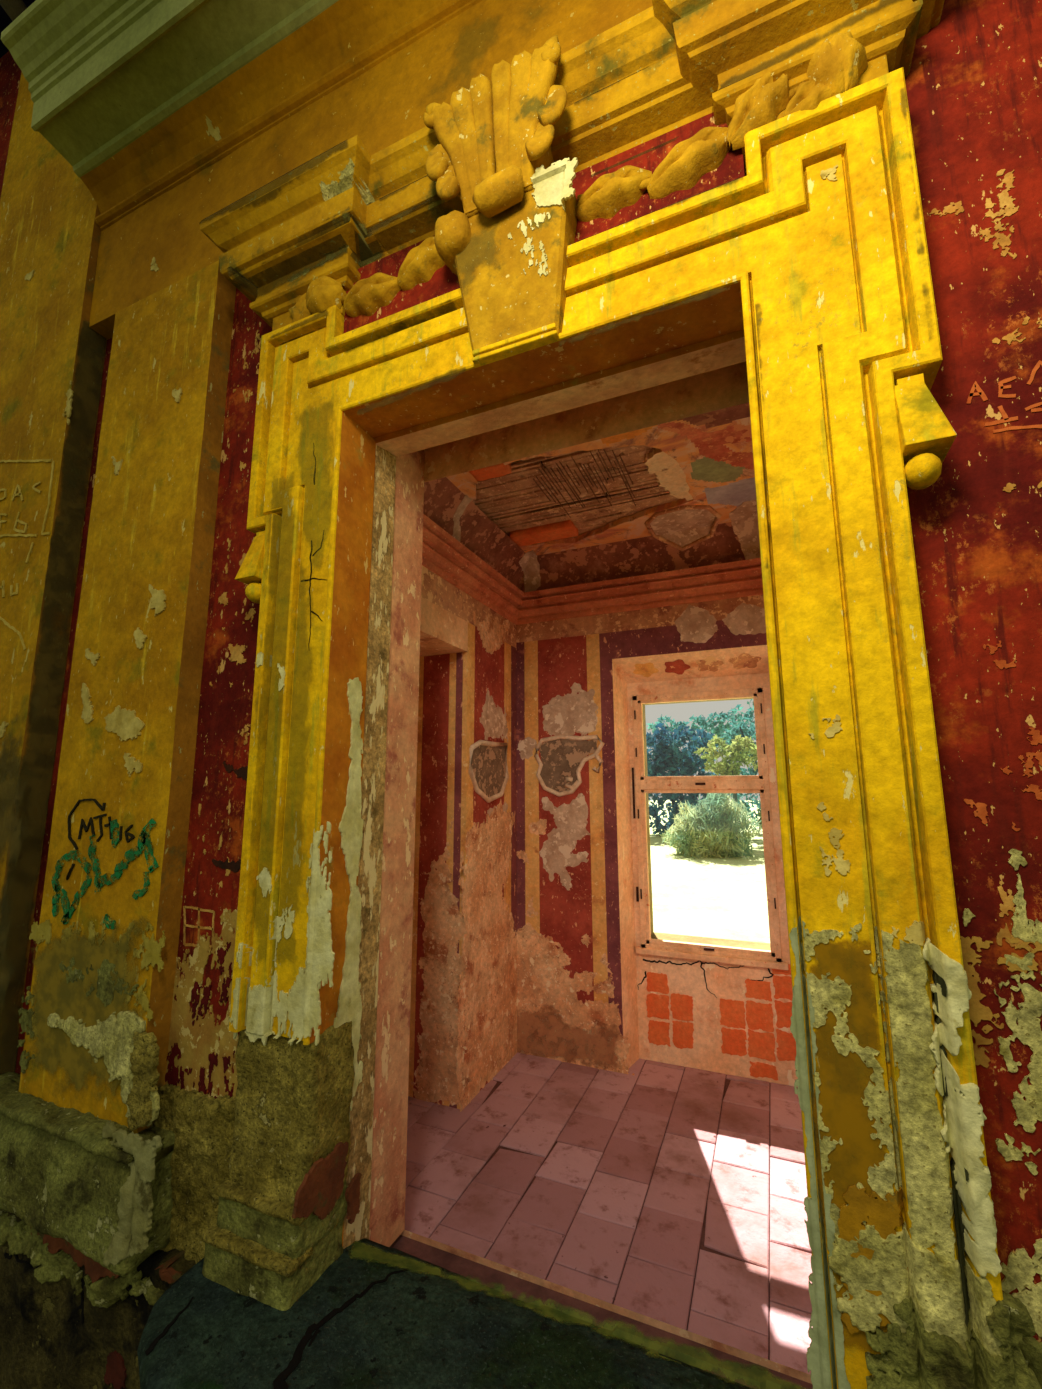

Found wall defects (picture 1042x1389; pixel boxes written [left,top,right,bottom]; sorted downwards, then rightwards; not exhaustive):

peeling [929,201,964,217]
peeling [979,169,1019,260]
peeling [992,316,1042,345]
peeling [644,448,693,501]
peeling [209,538,286,691]
crack [301,531,326,646]
peeling [1000,727,1042,801]
peeling [817,802,851,876]
flaking render [0,677,364,1308]
flaking render [646,972,694,1049]
crack [637,959,774,998]
flaking render [719,849,1042,1389]